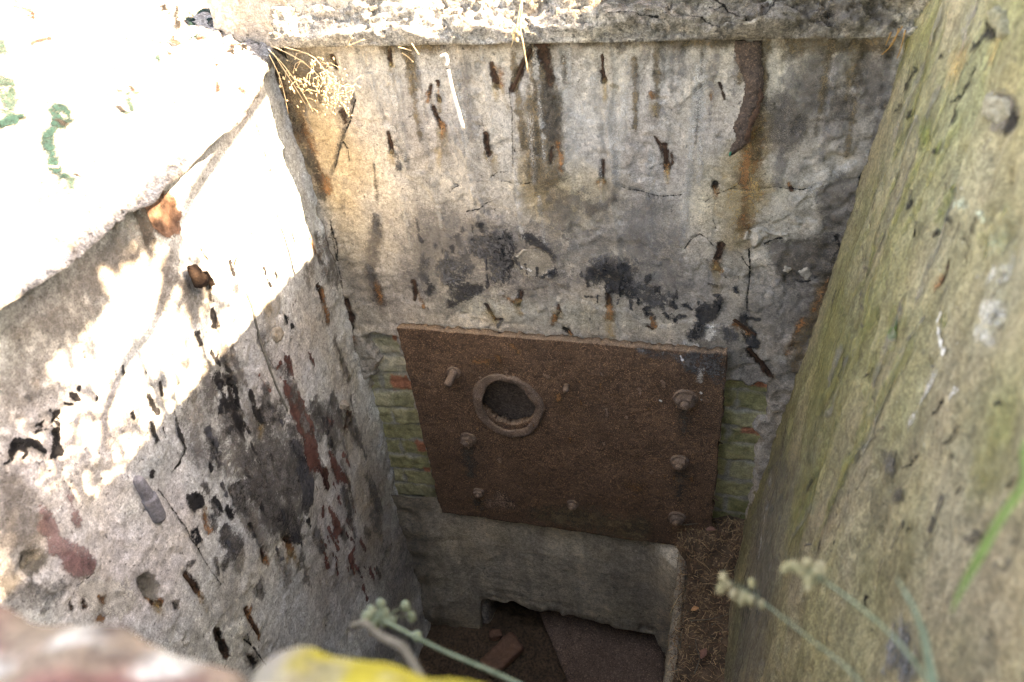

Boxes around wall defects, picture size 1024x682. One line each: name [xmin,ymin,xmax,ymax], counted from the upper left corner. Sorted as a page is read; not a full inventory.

rust [275,47,354,201]
rust [521,43,565,188]
rust [654,136,674,175]
rust [738,109,771,235]
rust [316,282,330,326]
water stain [416,220,558,308]
water stain [580,254,739,358]
crack [741,248,751,311]
water stain [0,226,315,507]
water stain [186,491,213,546]
rust [282,535,296,559]